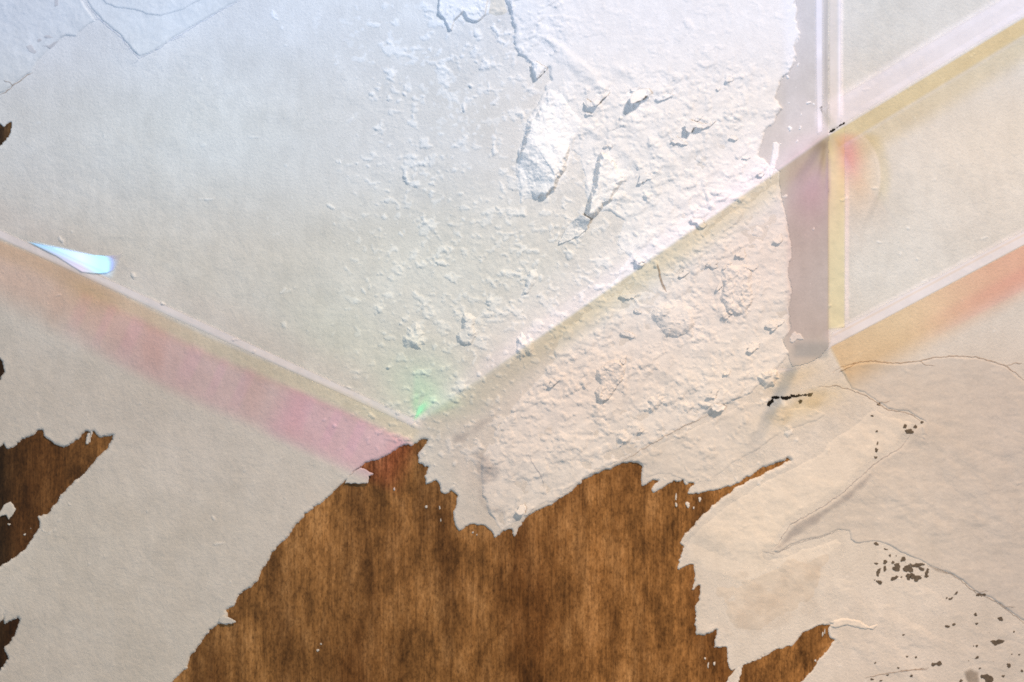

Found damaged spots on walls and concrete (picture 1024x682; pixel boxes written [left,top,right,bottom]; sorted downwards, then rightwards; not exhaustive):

peeling [173,0,929,682]
peeling [0,430,113,566]
crack [768,355,1024,554]
peeling [0,618,20,670]
crack [932,567,1020,620]
peeling [968,645,1023,682]